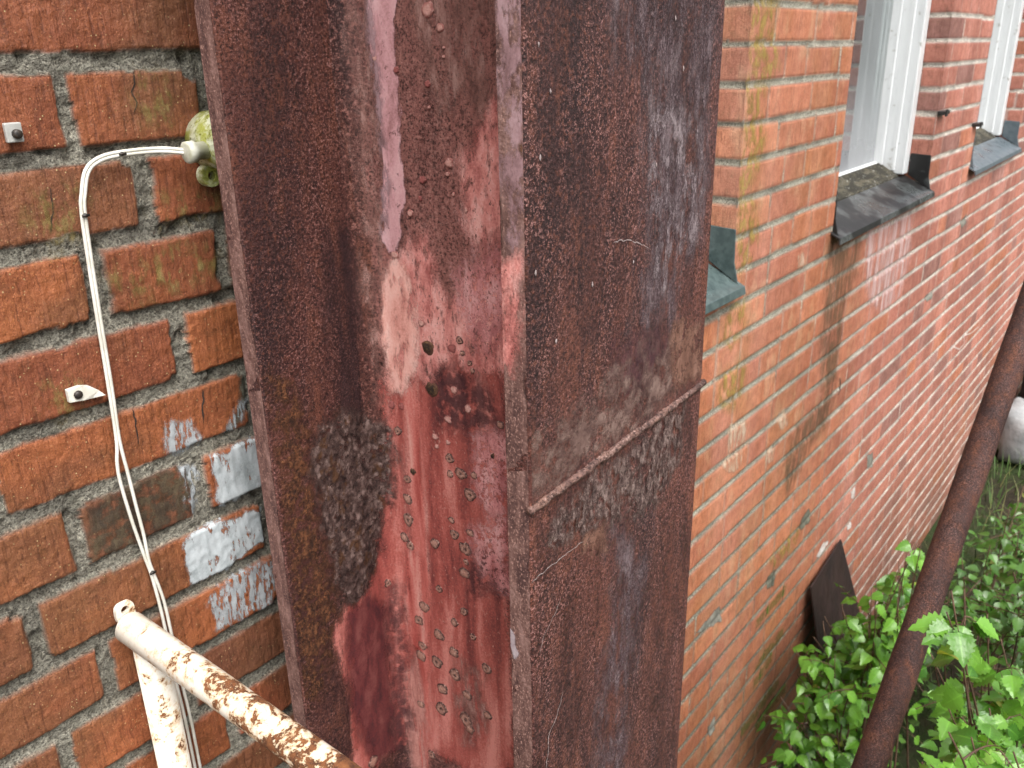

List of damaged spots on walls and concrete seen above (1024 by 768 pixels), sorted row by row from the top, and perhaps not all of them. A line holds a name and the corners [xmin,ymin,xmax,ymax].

peeling [165,420,202,513]
peeling [182,437,275,630]
spalling [224,377,247,433]
rust [194,0,306,728]
rust [310,409,416,605]
rust [422,340,434,355]
peeling [332,0,524,768]
rust [425,382,438,397]
rust [445,453,477,502]
rust [448,517,474,579]
rust [490,0,702,768]
rust [415,601,475,735]